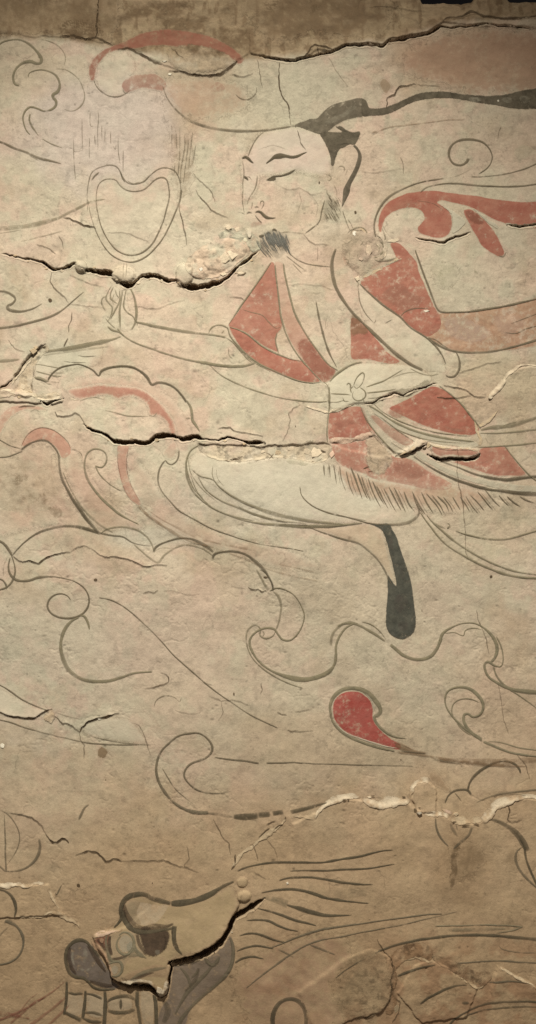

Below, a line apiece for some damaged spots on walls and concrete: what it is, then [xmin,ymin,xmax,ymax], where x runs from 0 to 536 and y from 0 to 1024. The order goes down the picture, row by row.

crack [60,0,536,146]
peeling [185,226,261,279]
crack [0,217,274,461]
flaking render [197,364,536,475]
crack [396,444,480,462]
crack [0,709,119,744]
crack [217,817,286,870]
crack [113,898,265,1000]